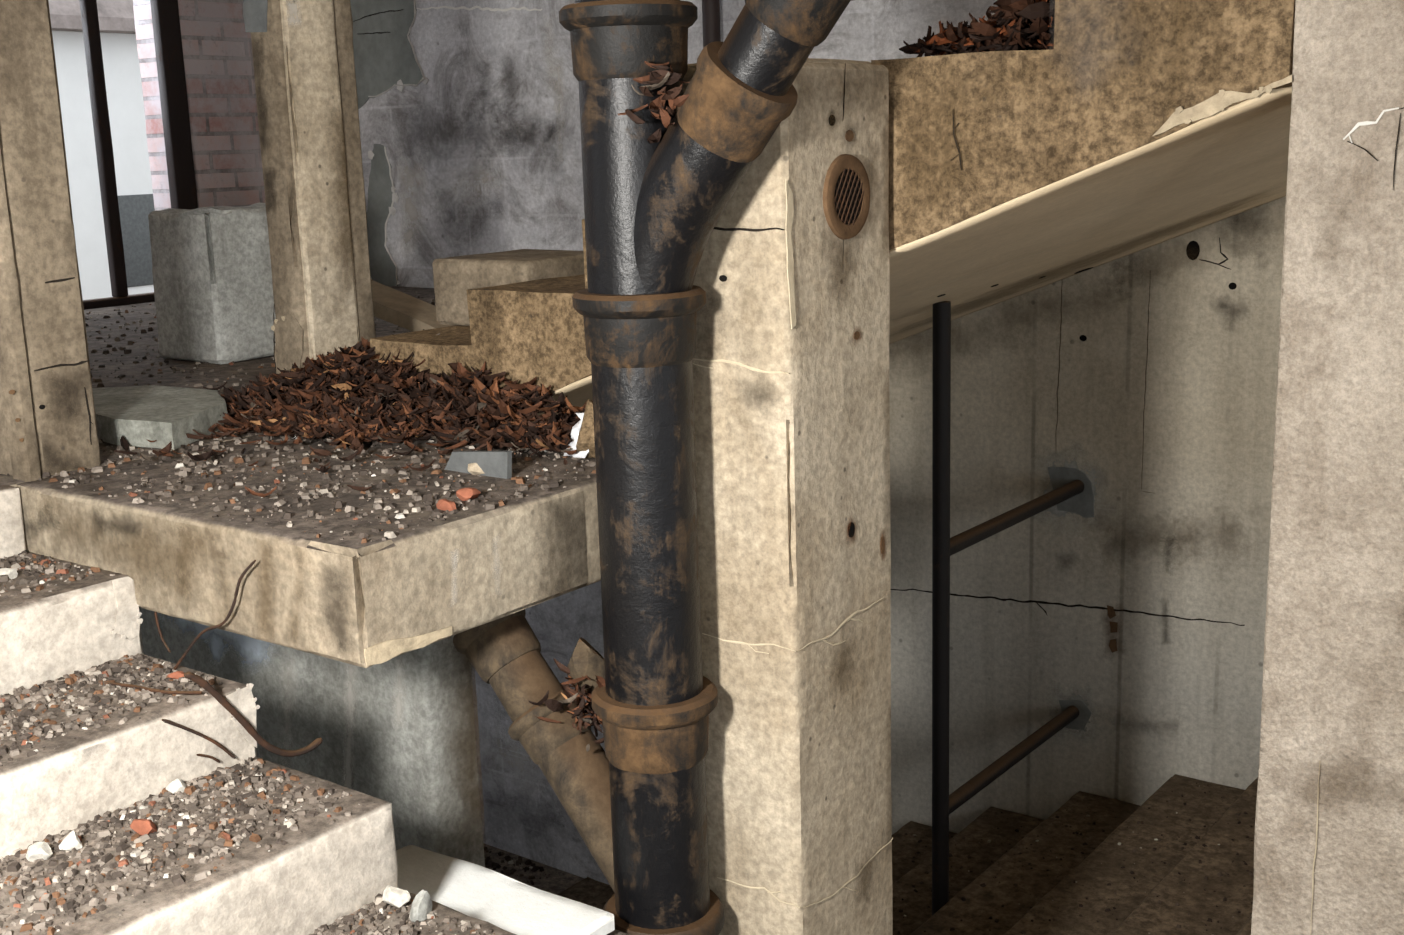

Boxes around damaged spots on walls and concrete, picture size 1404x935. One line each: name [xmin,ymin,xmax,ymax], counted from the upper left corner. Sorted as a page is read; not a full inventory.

spalling [350,0,429,111]
crack [1347,107,1404,190]
crack [891,589,1245,626]
rust [1107,605,1118,653]